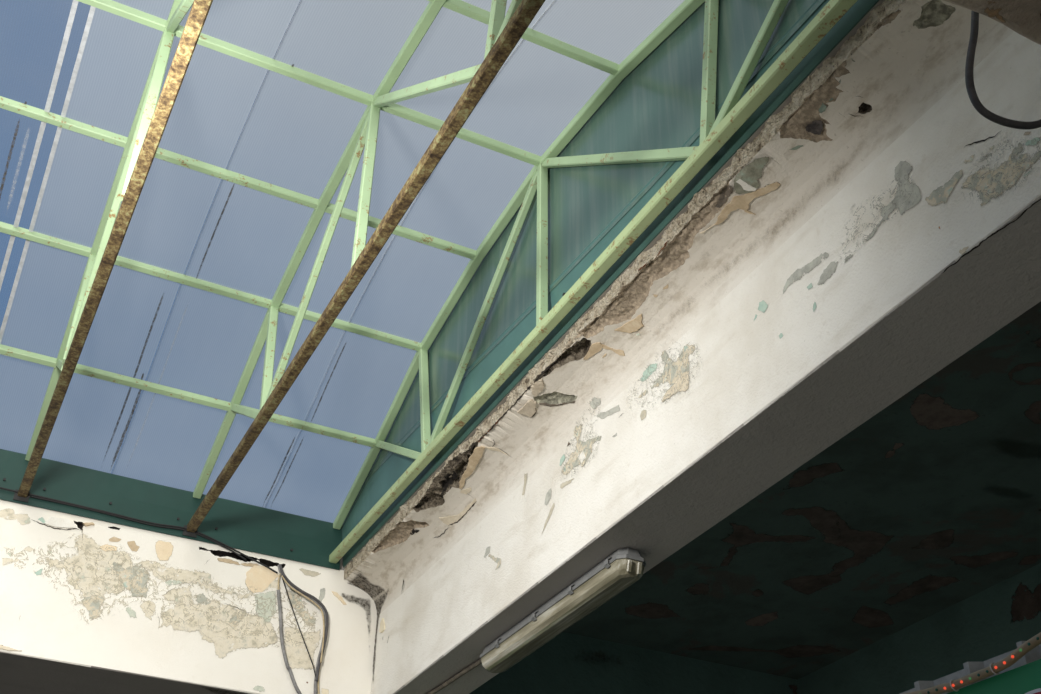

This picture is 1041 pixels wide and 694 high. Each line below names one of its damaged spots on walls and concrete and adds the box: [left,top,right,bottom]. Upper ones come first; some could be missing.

spalling [913,0,956,29]
spalling [533,156,780,382]
peeling [783,132,1041,294]
peeling [2,521,321,683]
spalling [371,442,485,553]
peeling [484,547,501,570]
flaking render [517,391,577,417]
peeling [542,343,698,533]